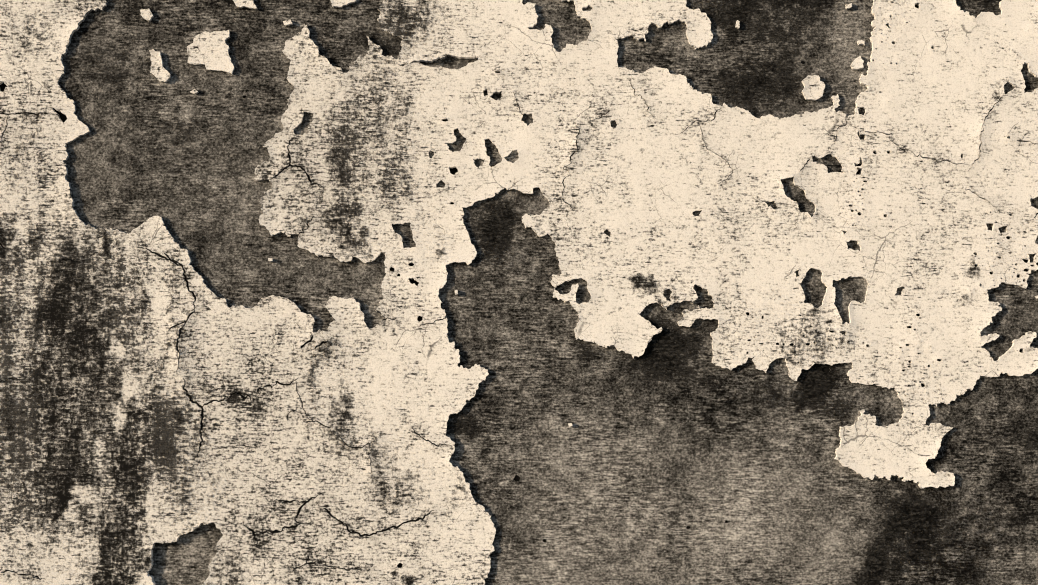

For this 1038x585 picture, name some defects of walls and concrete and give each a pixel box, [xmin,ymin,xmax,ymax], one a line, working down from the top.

peeling [617,0,894,119]
peeling [55,0,478,332]
crack [272,140,322,187]
leakage [0,212,48,493]
leakage [100,228,151,343]
crack [137,247,196,359]
leakage [165,253,187,358]
leakage [151,376,219,526]
crack [184,378,380,471]
peeling [438,188,1038,585]
flaking render [148,522,223,585]
crack [243,493,434,545]